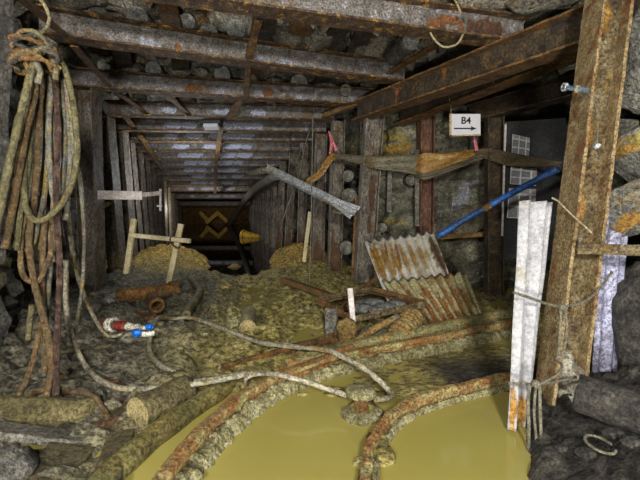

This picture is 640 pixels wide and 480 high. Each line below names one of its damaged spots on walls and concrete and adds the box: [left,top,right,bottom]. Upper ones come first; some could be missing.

corrosion [427,15,502,36]
corrosion [369,243,427,279]
corrosion [429,237,447,275]
corrosion [419,286,473,325]
corrosion [508,387,526,431]